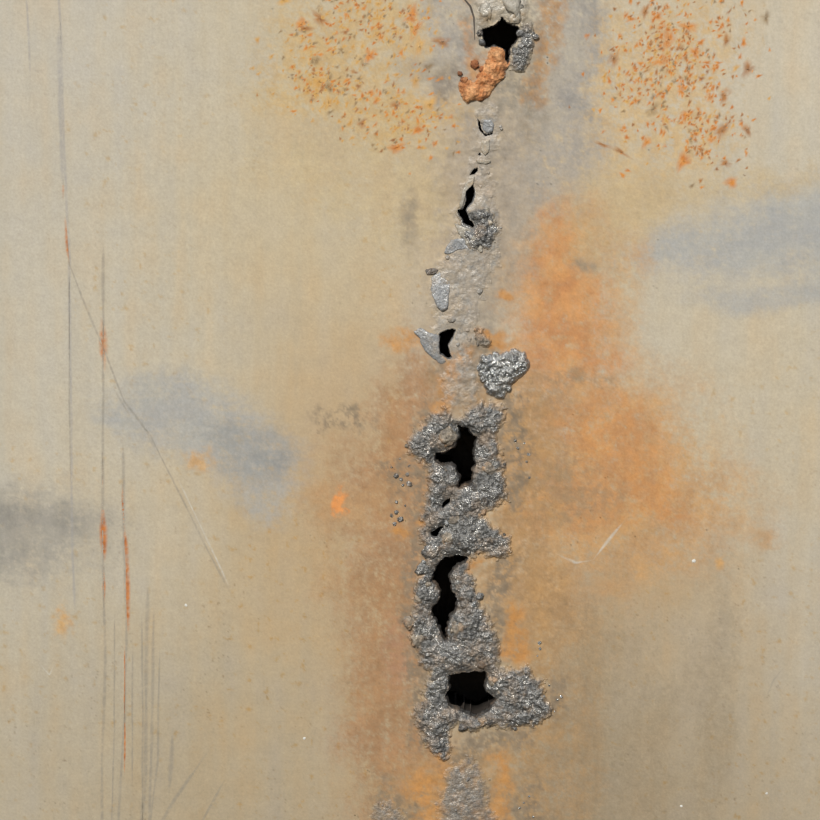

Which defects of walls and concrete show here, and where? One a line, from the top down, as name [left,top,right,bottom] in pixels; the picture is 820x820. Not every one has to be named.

corrosion [233,0,484,164]
corrosion [476,0,803,623]
leakage [0,314,141,576]
corrosion [98,504,108,602]
corrosion [121,481,131,634]
corrosion [469,554,488,575]
corrosion [499,596,537,669]
corrosion [390,753,453,820]